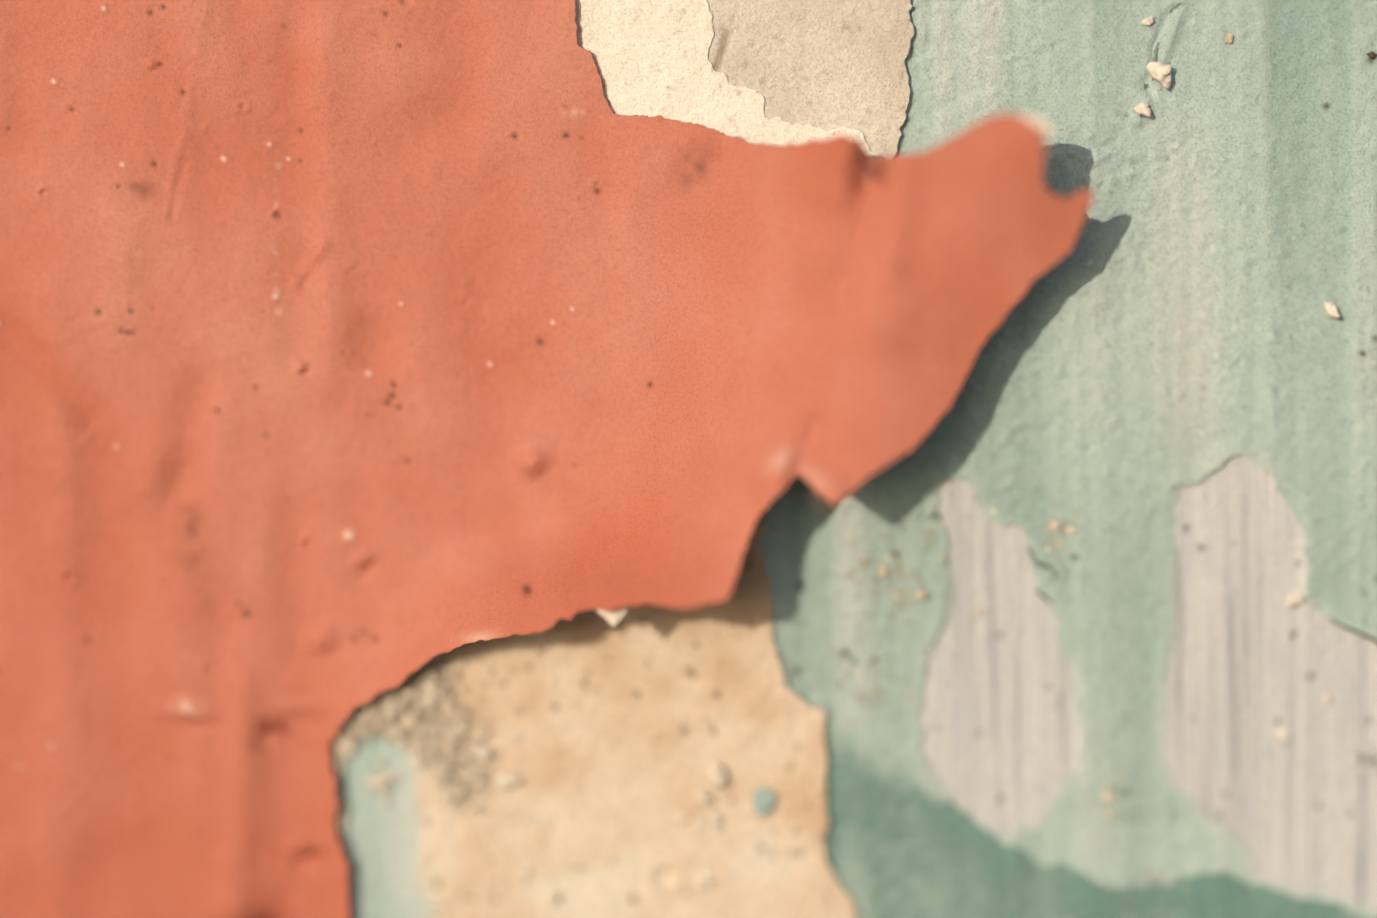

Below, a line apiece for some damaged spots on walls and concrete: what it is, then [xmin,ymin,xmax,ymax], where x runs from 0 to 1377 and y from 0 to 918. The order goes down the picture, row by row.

peeling [326,0,1094,918]
peeling [1156,454,1377,910]